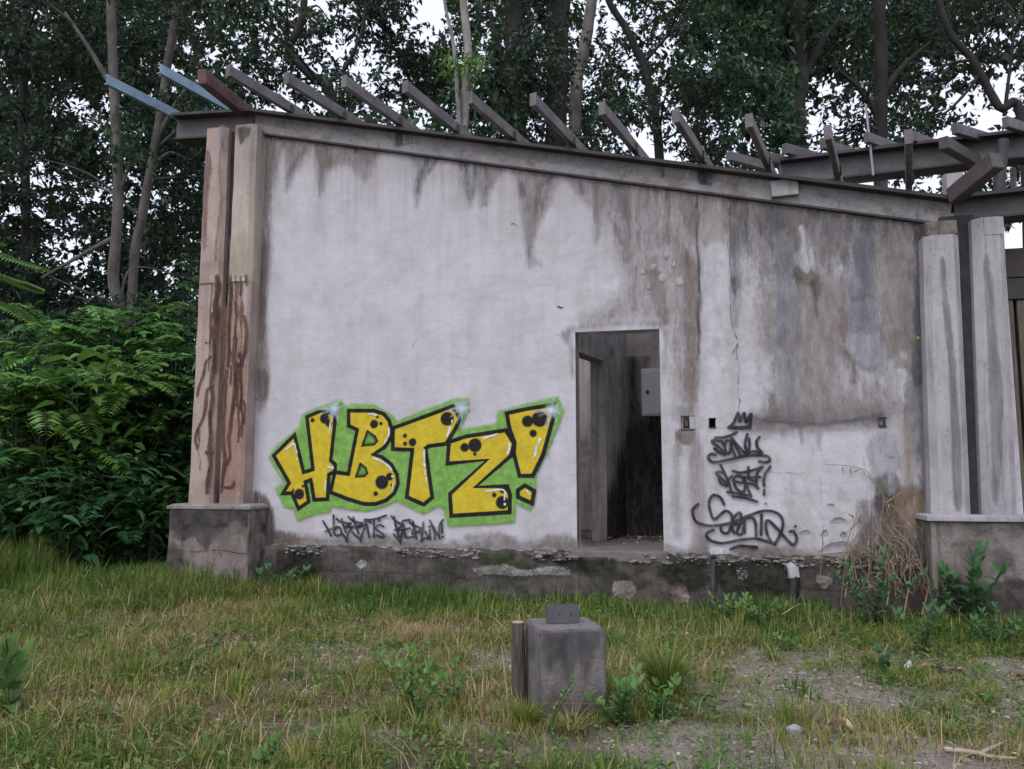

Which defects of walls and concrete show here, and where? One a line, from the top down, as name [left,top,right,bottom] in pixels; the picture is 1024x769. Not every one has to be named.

leakage [502,148,619,250]
rust [208,284,243,385]
leakage [575,167,961,540]
spalling [392,548,580,577]
spalling [629,503,922,588]
leakage [830,474,921,559]